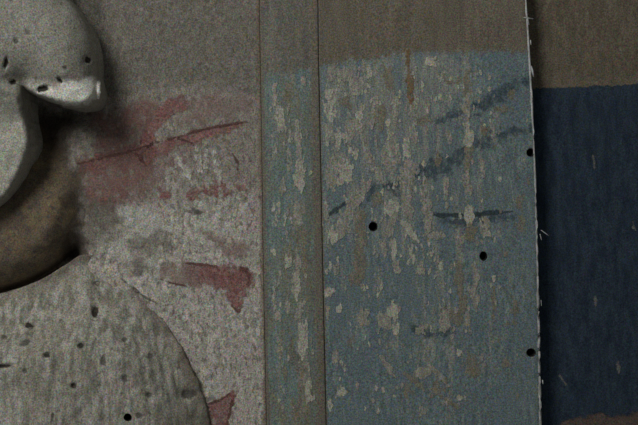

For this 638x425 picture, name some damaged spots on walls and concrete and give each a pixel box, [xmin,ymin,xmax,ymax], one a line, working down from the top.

peeling [269,82,312,240]
peeling [322,56,525,378]
spalling [506,0,549,425]
peeling [272,248,315,413]
peeling [328,350,359,412]
peeling [348,300,466,411]